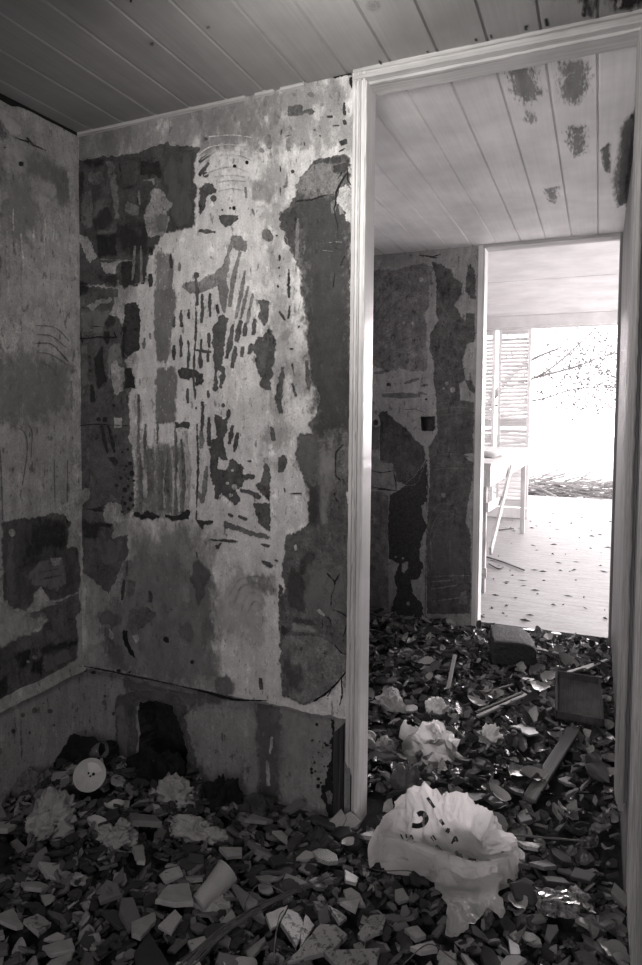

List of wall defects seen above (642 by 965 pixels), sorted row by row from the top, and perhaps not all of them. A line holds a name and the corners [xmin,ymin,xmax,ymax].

damp [612,0,642,11]
damp [613,112,635,206]
peeling [0,92,352,705]
peeling [369,261,476,618]
crack [84,666,267,702]